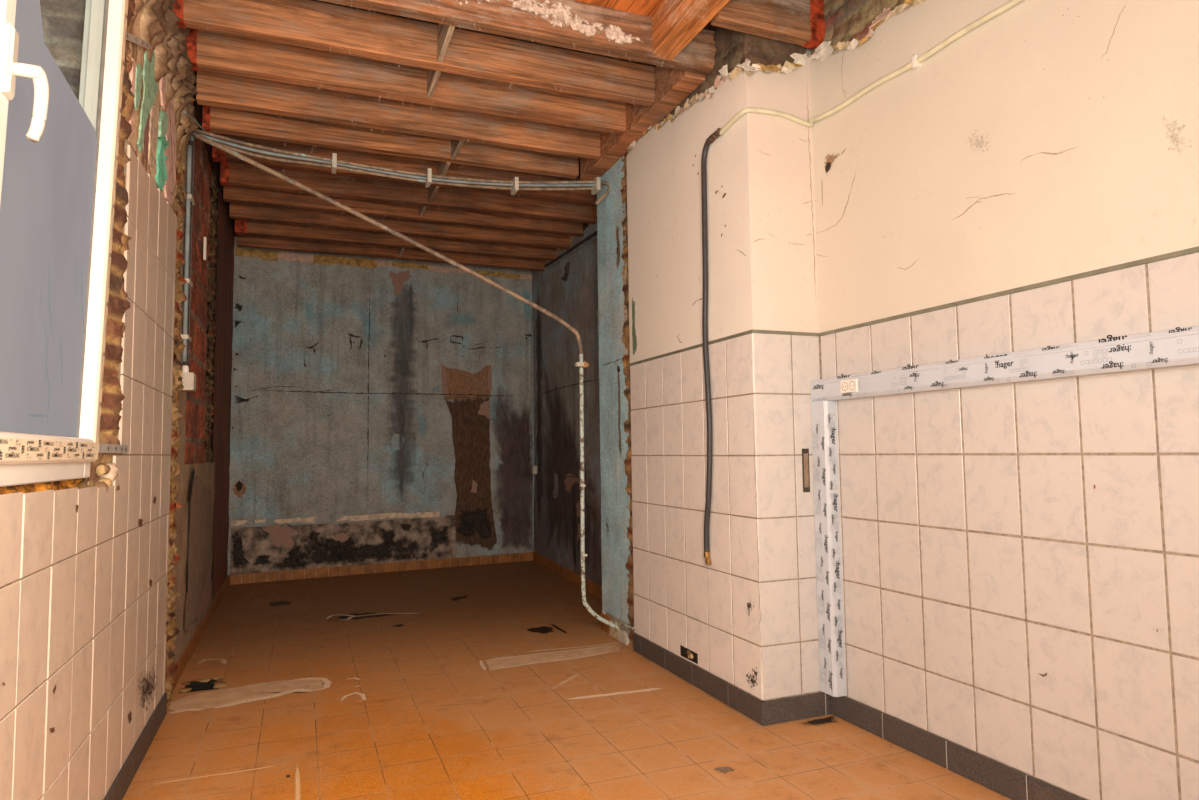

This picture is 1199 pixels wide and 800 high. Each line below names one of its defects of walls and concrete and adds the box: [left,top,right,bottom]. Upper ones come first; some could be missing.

damp [456,0,643,44]
flaking render [626,0,927,152]
flaking render [77,0,176,489]
flaking render [203,162,222,463]
flaking render [235,207,597,295]
crack [953,193,1008,220]
flaking render [334,512,440,542]
damp [231,287,596,575]
flaking render [441,363,497,550]